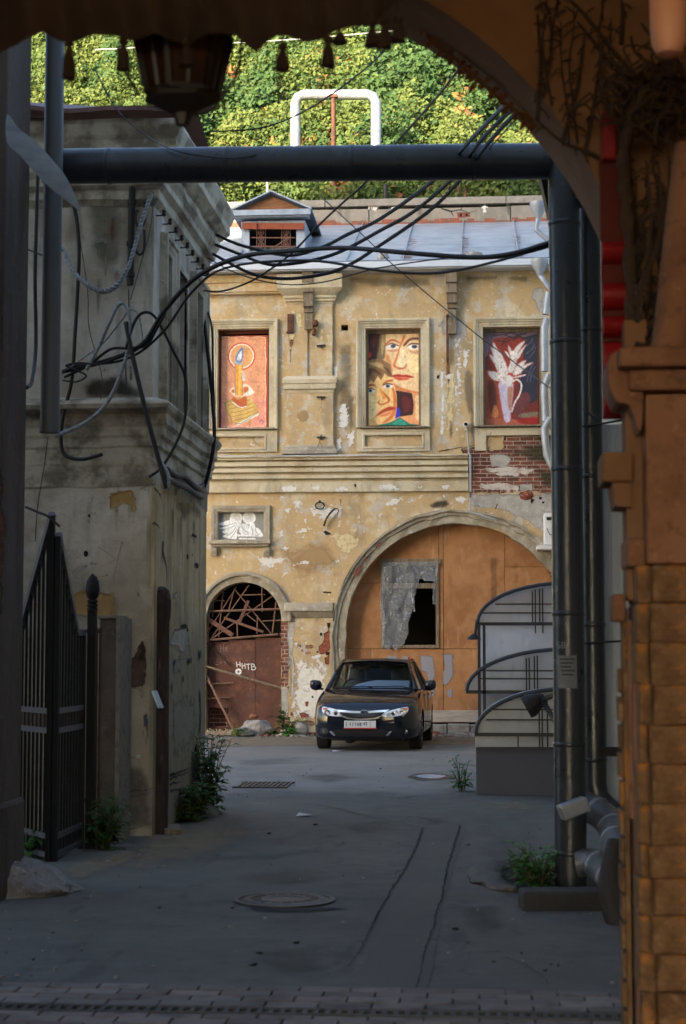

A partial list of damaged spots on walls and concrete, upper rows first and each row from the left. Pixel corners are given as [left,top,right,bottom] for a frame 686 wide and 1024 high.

peeling [437,316,470,435]
peeling [336,404,355,451]
peeling [109,490,136,512]
peeling [378,482,400,519]
flaking render [442,435,551,532]
flaking render [131,641,147,698]
peeling [279,620,330,726]